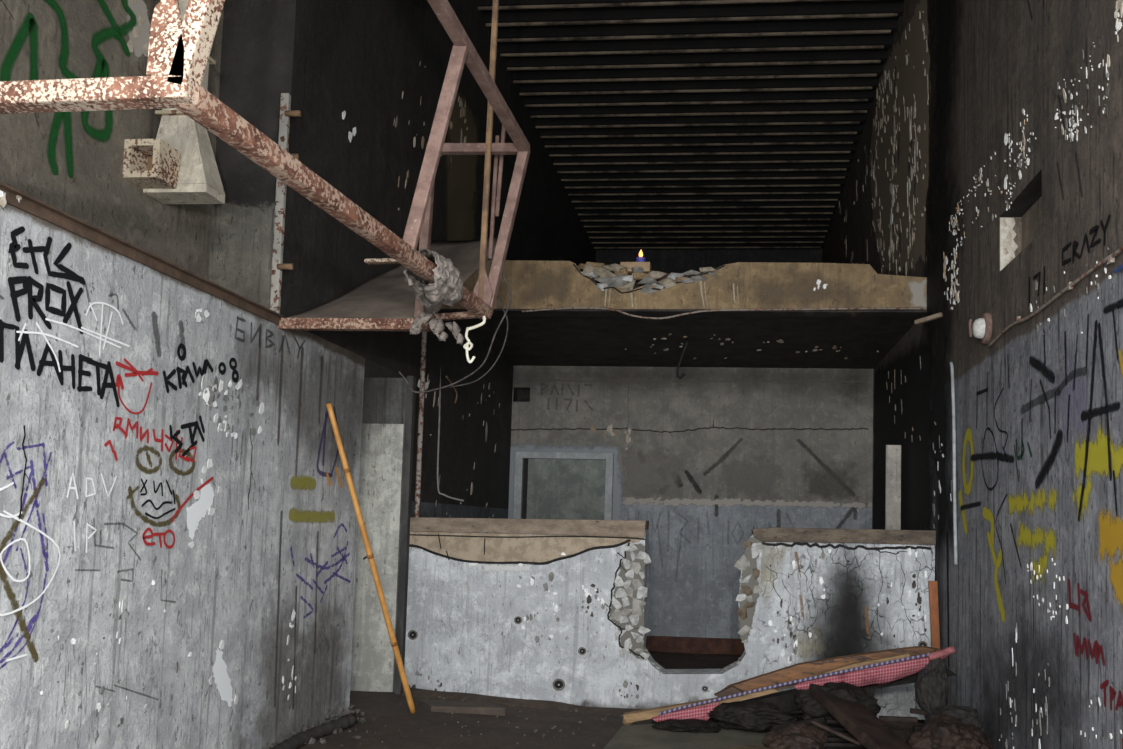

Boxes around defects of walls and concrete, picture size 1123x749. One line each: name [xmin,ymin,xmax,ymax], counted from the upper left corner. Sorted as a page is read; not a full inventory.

flaking render [943,109,1036,310]
spalling [573,262,725,294]
crack [511,419,868,436]
crack [762,542,931,644]
damp [829,605,857,658]